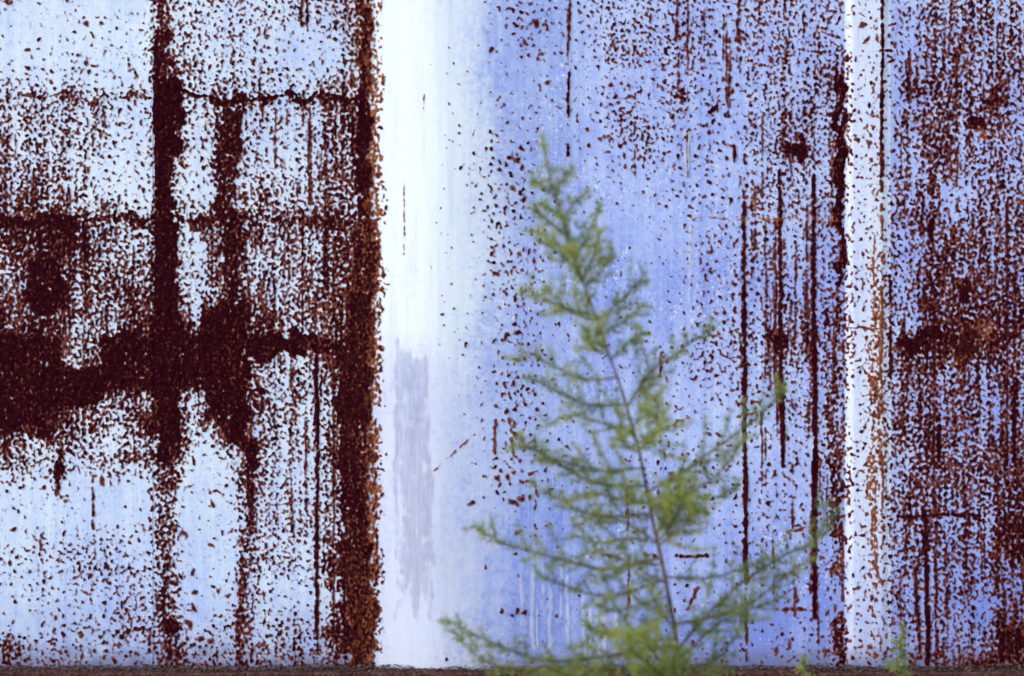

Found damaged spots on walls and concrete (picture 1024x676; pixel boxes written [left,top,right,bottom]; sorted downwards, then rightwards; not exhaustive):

corrosion [0,0,389,669]
corrosion [459,0,1024,669]